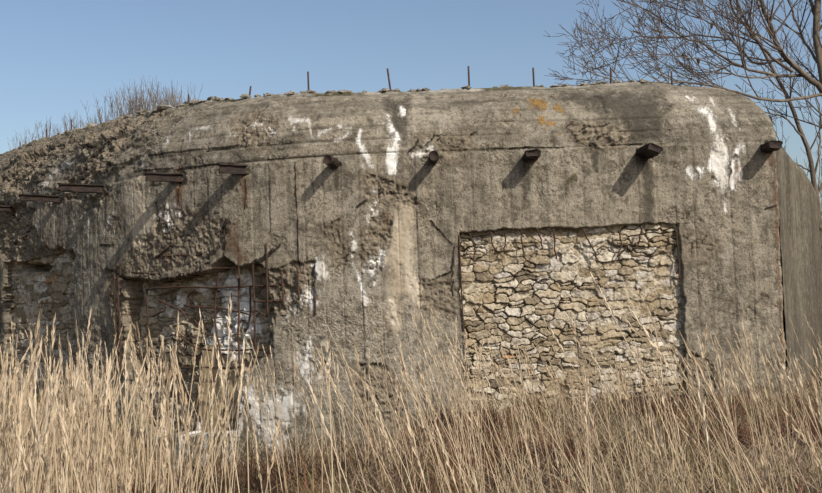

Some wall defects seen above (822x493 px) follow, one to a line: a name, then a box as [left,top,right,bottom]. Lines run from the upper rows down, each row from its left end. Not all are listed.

leakage [288,116,375,169]
leakage [384,98,409,175]
leakage [410,140,435,158]
crack [408,132,478,153]
efflorescence [685,95,745,212]
spalling [102,168,424,383]
leakage [296,336,321,387]
leakage [174,367,306,468]